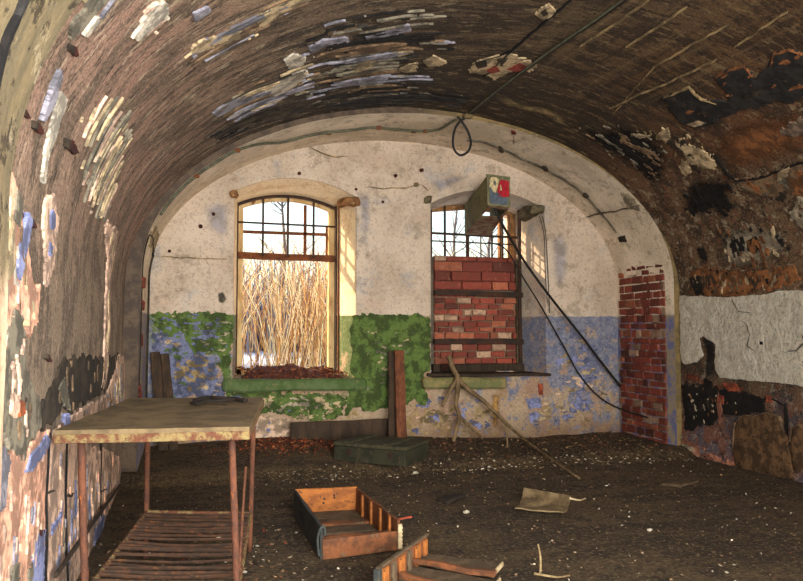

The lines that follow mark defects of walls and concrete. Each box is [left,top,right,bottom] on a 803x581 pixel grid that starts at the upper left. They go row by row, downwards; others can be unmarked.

peeling [184,0,309,63]
peeling [210,9,471,140]
peeling [468,53,537,81]
spalling [631,48,803,226]
peeling [0,68,133,581]
peeling [138,225,498,438]
peeling [522,323,608,433]
flaking render [618,264,668,444]
peeling [681,437,736,467]